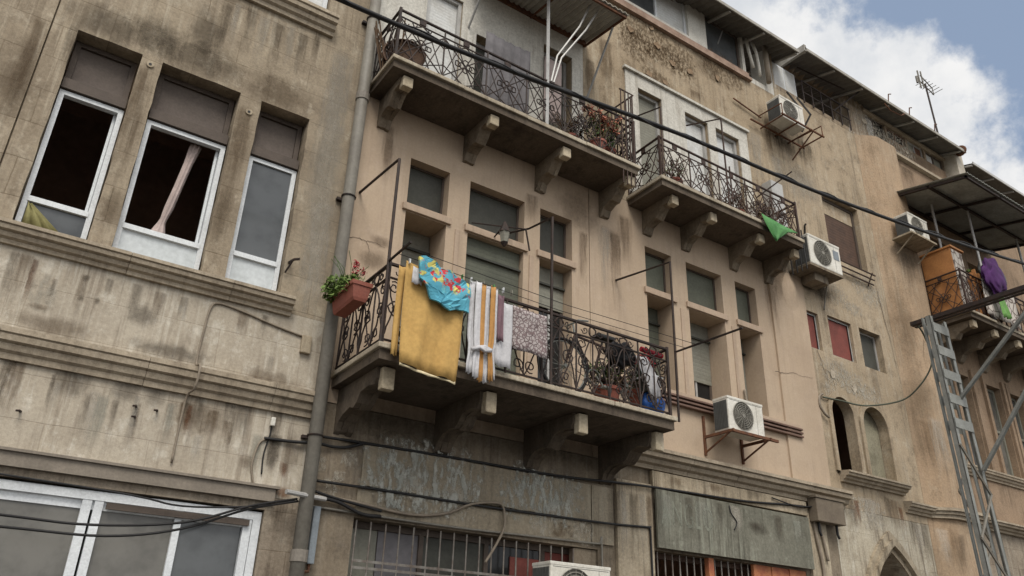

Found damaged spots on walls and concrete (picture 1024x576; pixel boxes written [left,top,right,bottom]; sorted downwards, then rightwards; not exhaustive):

spalling [621,19,742,89]
peeling [342,438,486,520]
peeling [500,468,593,538]